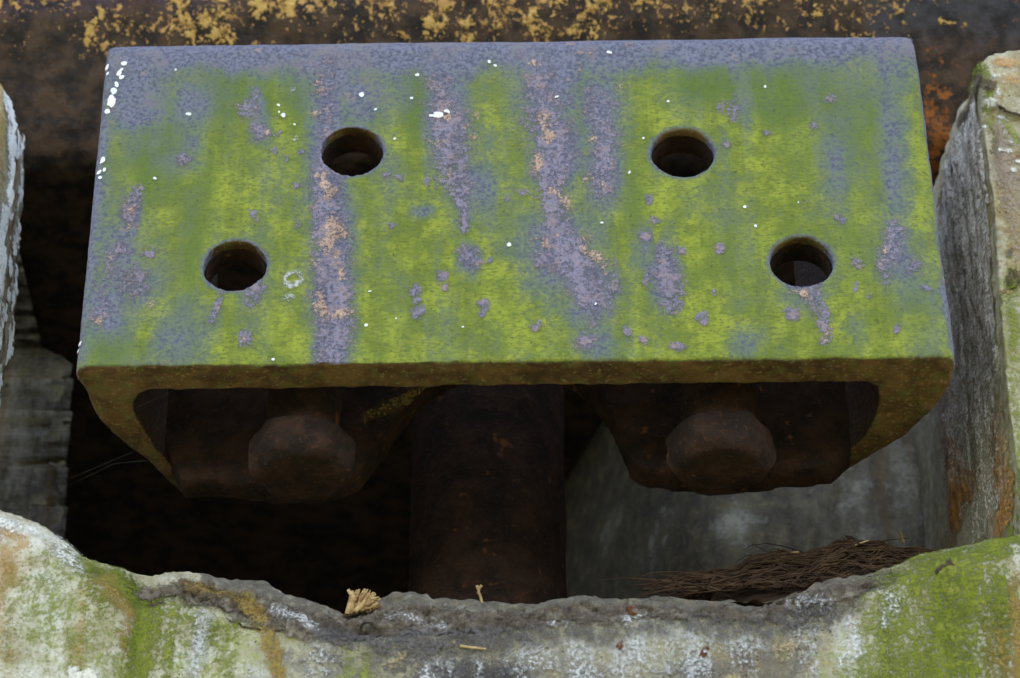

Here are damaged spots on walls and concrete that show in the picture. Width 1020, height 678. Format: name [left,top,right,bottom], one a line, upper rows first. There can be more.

crack [996,104,1020,117]
damp [784,65,1020,678]
damp [298,634,553,678]
damp [565,625,711,678]
damp [725,629,774,671]